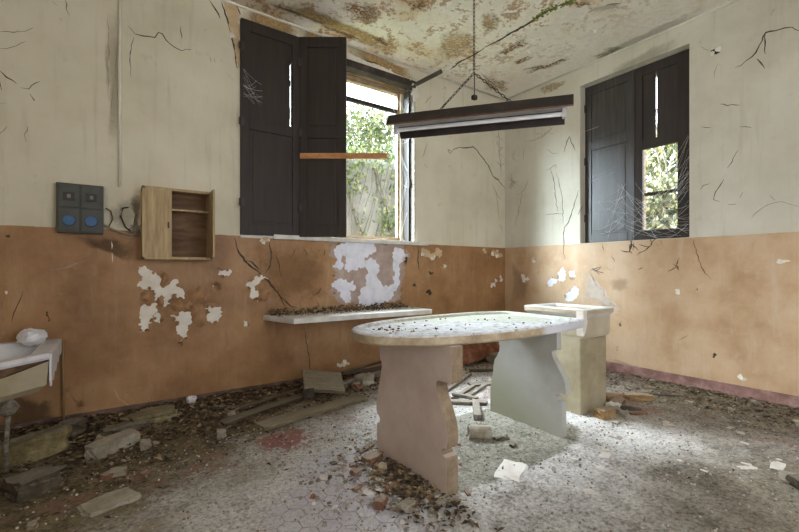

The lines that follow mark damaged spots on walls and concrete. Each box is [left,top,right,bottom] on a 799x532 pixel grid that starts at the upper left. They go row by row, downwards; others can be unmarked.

crack [128,26,191,75]
crack [714,12,799,74]
peeling [347,52,419,102]
crack [447,128,582,259]
peeling [137,266,192,347]
peeling [204,302,222,324]
peeling [209,265,232,293]
peeling [246,274,268,302]
crack [234,238,325,308]
peeling [329,242,410,307]
peeling [421,248,447,270]
peeling [546,268,579,302]